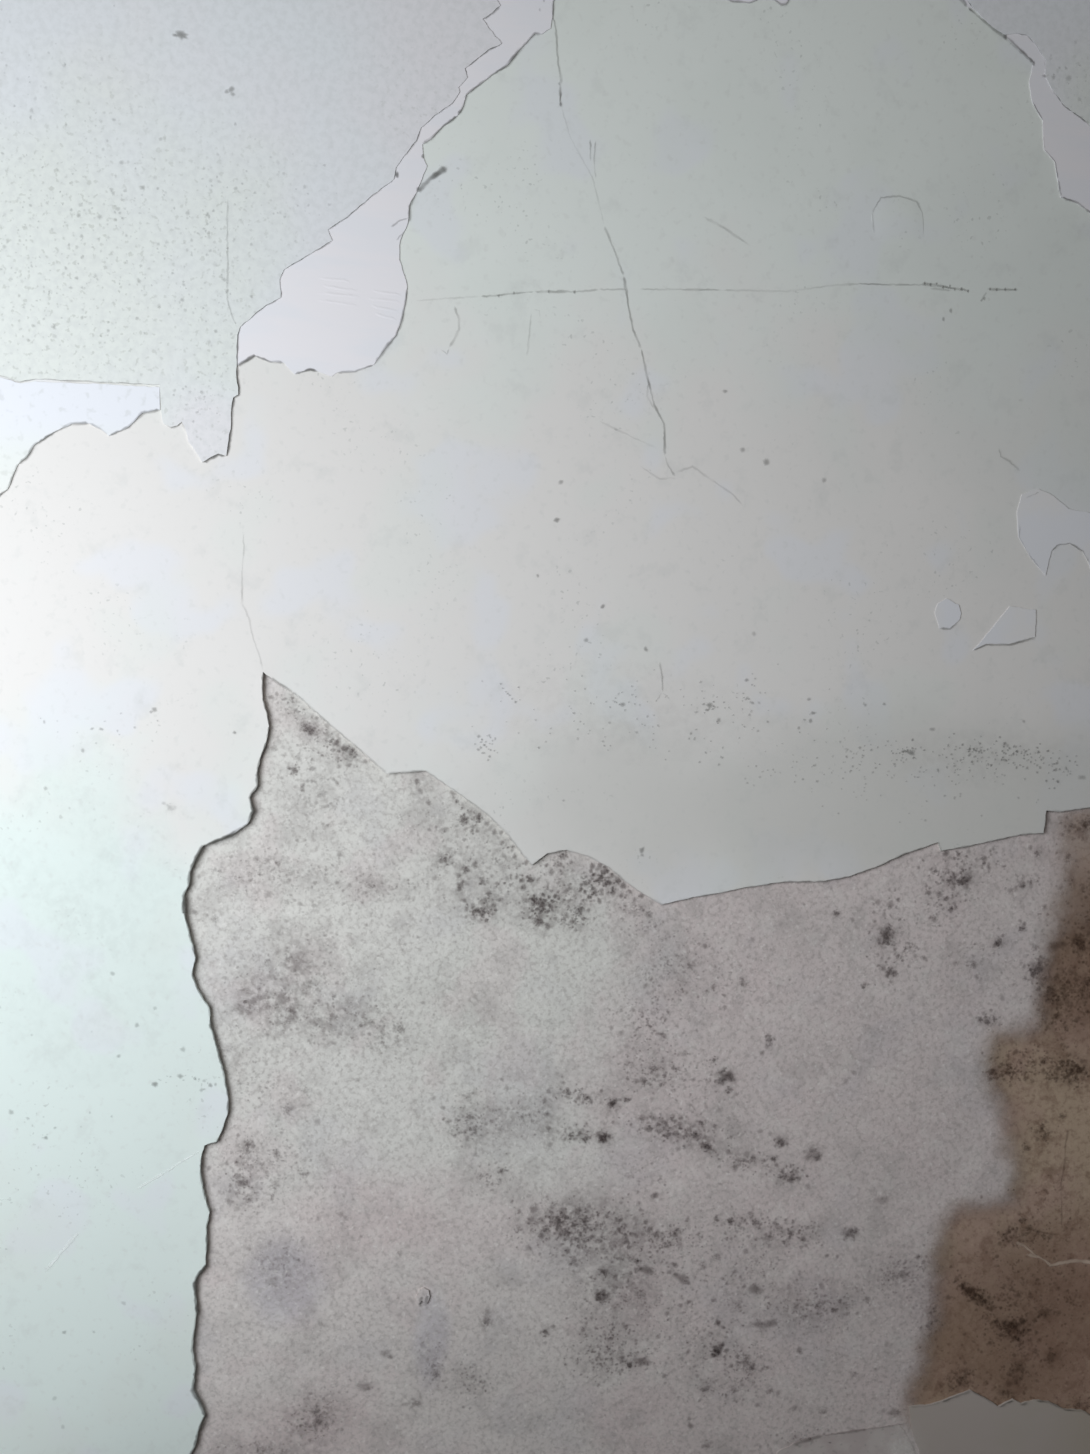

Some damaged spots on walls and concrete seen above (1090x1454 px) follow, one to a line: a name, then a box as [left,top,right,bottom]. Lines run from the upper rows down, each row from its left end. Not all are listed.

peeling [237,0,554,376]
peeling [1006,33,1090,213]
flaking render [182,672,1090,1454]
leakage [910,812,1090,1414]